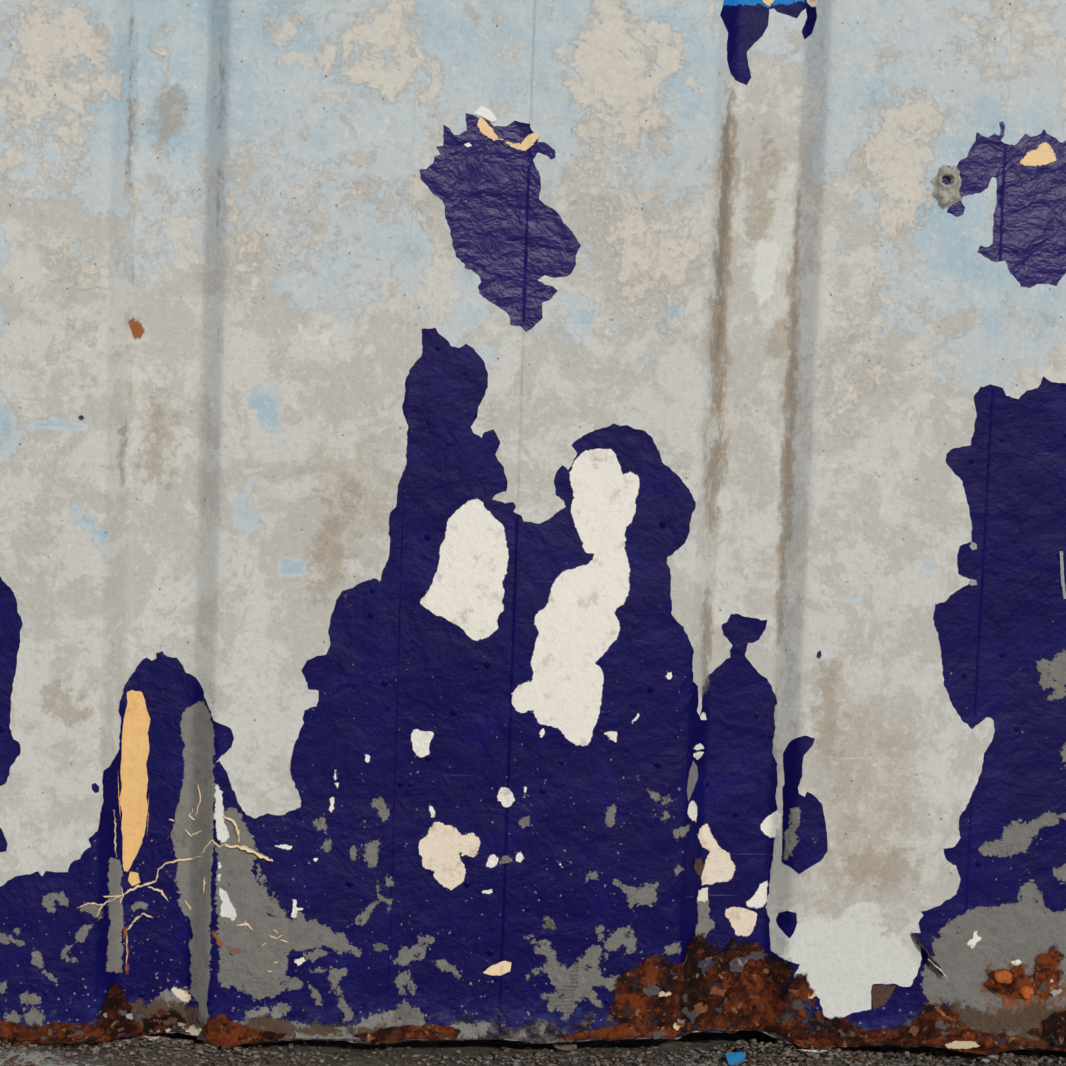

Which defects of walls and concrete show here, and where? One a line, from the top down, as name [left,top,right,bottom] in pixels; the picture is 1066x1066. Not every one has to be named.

peeling [720,0,819,85]
corrosion [129,318,145,339]
peeling [0,328,828,1043]
peeling [841,376,1066,1049]
crack [77,839,228,964]
corrosion [0,983,461,1049]
corrosion [559,933,1066,1055]